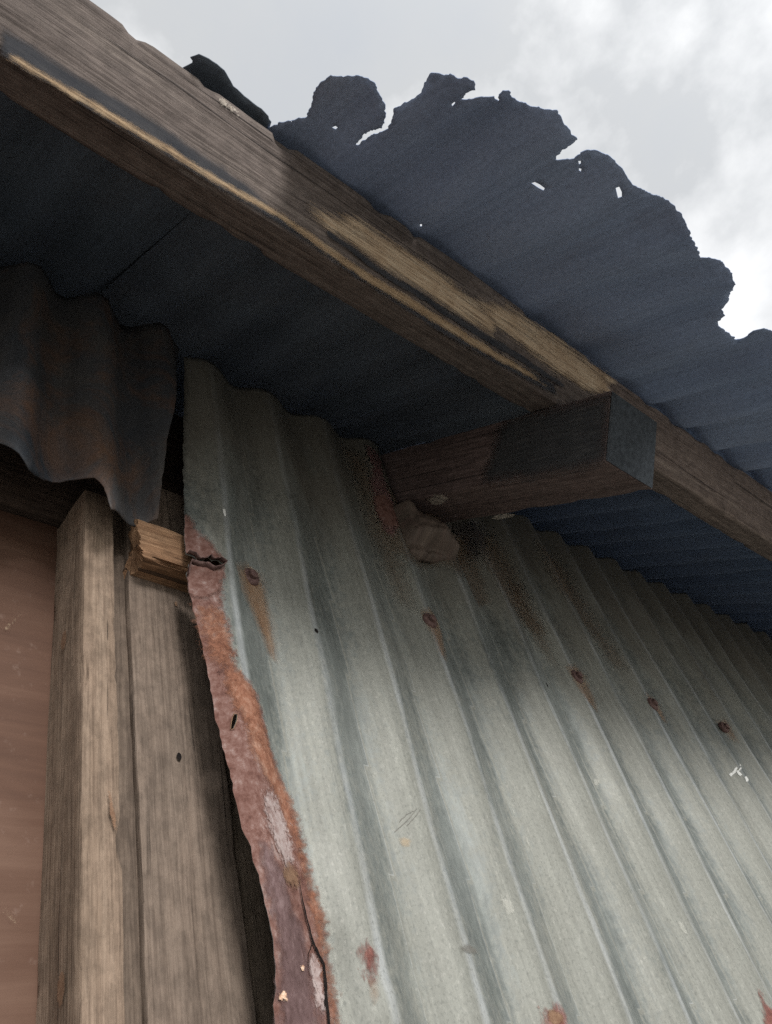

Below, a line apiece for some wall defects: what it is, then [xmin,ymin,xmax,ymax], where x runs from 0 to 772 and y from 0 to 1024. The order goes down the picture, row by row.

corrosion [186,564,339,1024]
crack [299,881,330,1024]
corrosion [360,943,375,980]
corrosion [538,1005,567,1024]